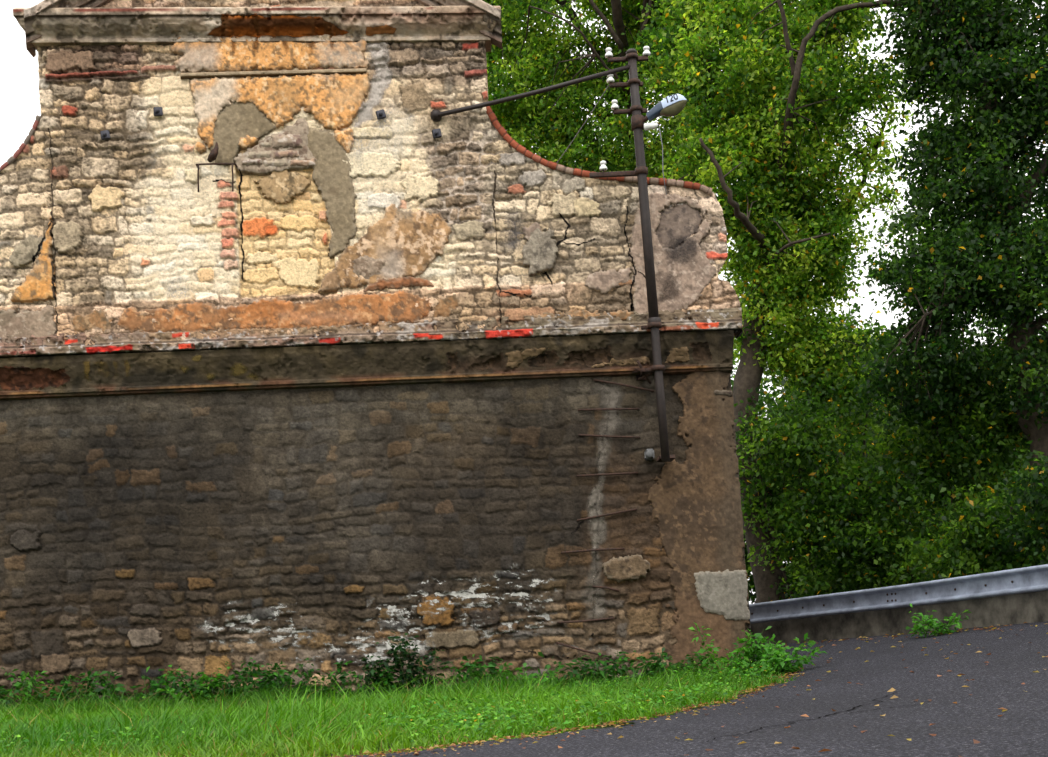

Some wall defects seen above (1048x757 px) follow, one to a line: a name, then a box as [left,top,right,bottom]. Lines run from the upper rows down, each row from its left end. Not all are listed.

peeling [0,217,57,341]
peeling [70,37,461,334]
crack [492,170,552,324]
crack [556,213,595,247]
crack [624,206,645,314]
peeling [445,345,650,371]
peeling [648,342,750,672]
efflorescence [203,604,311,659]
efflorescence [316,570,553,662]
crack [707,693,915,742]